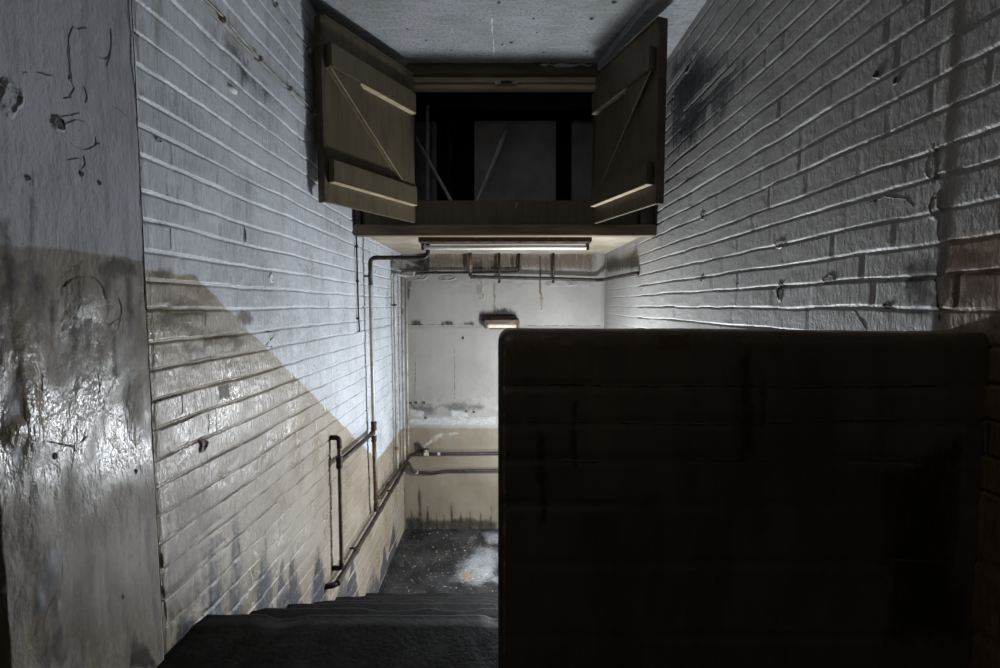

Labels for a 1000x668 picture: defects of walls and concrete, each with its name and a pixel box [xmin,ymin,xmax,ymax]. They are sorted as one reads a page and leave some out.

peeling [0,77,25,120]
spalling [51,115,68,133]
leakage [6,381,22,418]
leakage [406,492,497,529]